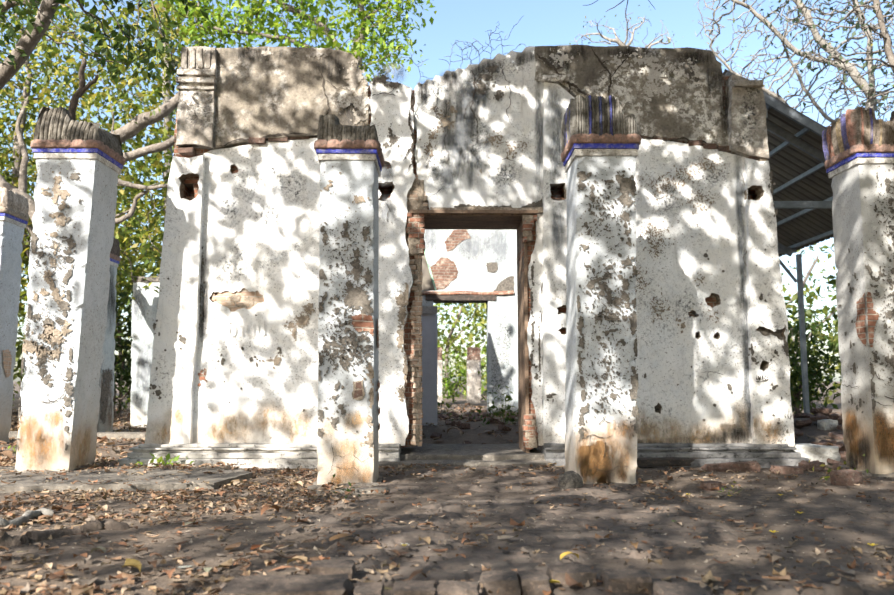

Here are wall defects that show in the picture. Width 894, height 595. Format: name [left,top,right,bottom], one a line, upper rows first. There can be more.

crack [319,70,347,115]
crack [372,58,519,173]
damp [420,53,534,189]
peeling [544,46,580,68]
peeling [601,46,701,104]
flaking render [2,171,83,452]
flaking render [198,246,265,337]
flaking render [284,194,381,456]
flaking render [430,229,471,290]
flaking render [576,153,729,444]